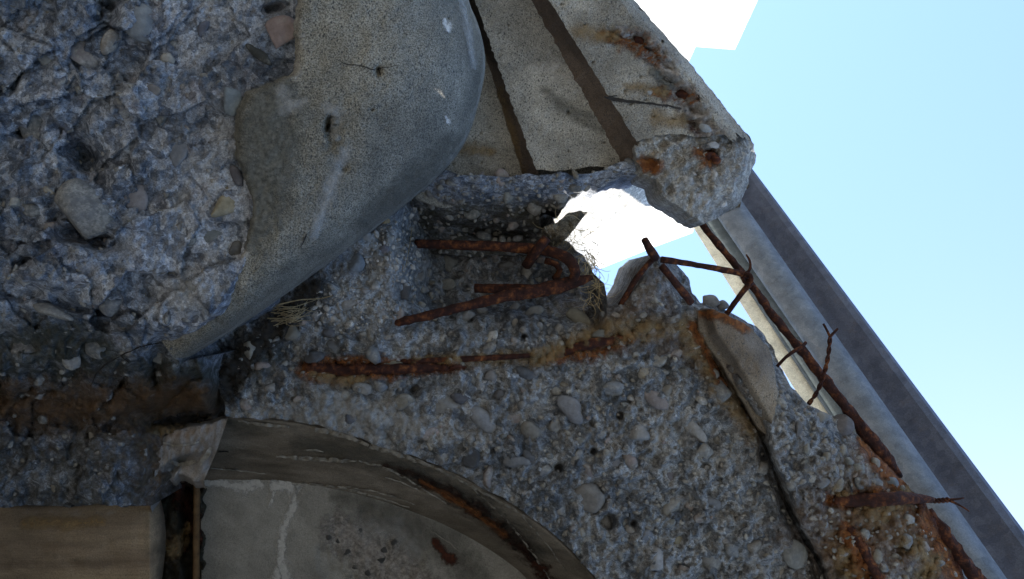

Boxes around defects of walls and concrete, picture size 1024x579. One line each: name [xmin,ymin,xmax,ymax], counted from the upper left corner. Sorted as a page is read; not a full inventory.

corrosion [576,27,666,66]
corrosion [636,156,664,175]
corrosion [627,84,716,168]
spalling [394,235,593,327]
spalling [306,353,537,377]
corrosion [297,320,662,387]
spalling [563,335,624,356]
corrosion [678,309,762,436]
peeling [276,428,566,579]
crack [754,425,826,579]
corrosion [824,437,964,579]